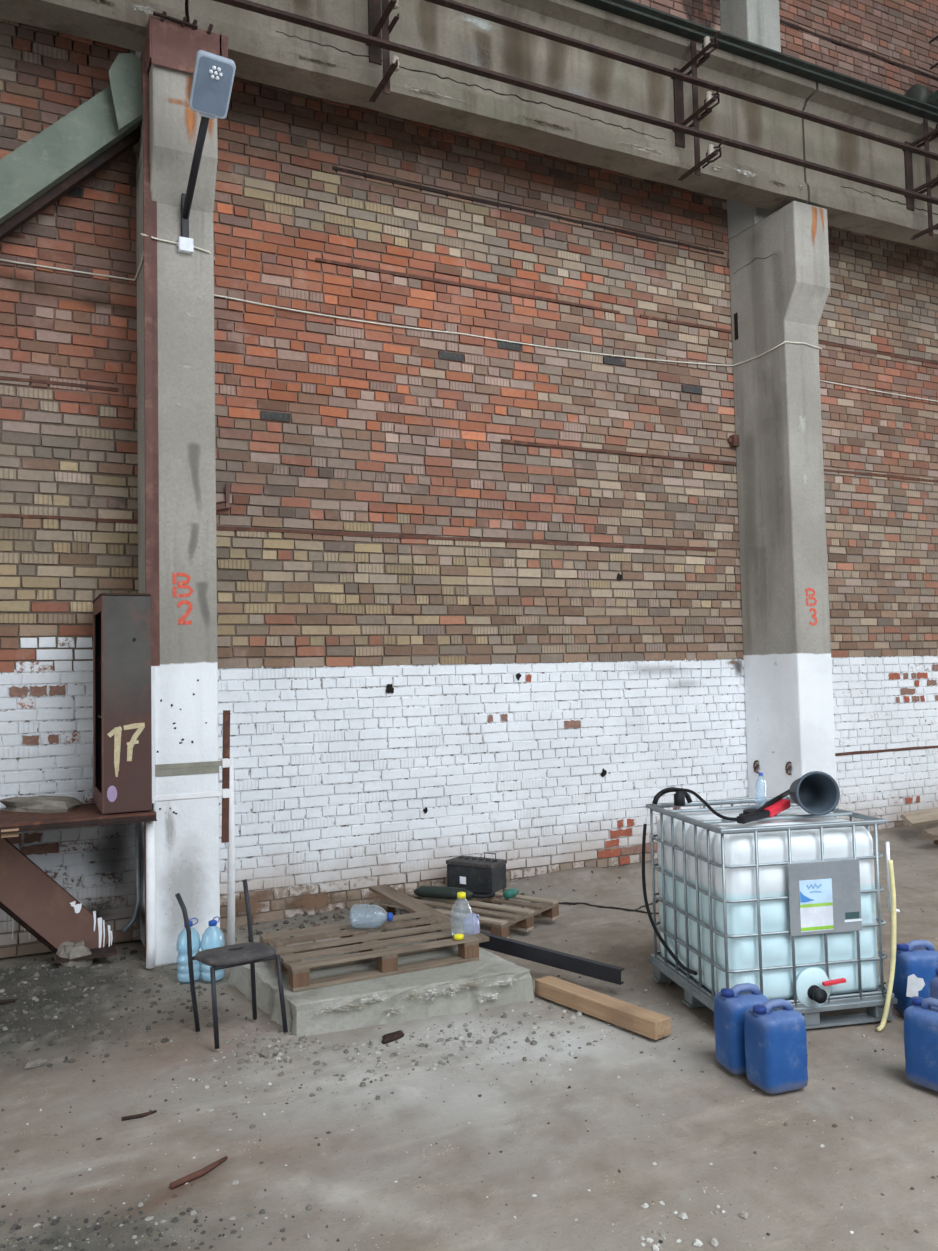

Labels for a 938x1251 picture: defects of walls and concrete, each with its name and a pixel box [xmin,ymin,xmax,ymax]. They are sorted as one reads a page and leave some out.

rust [174,77,212,132]
rust [812,207,824,238]
peeling [9,685,66,697]
peeling [889,664,938,703]
peeling [22,734,59,745]
peeling [598,819,658,865]